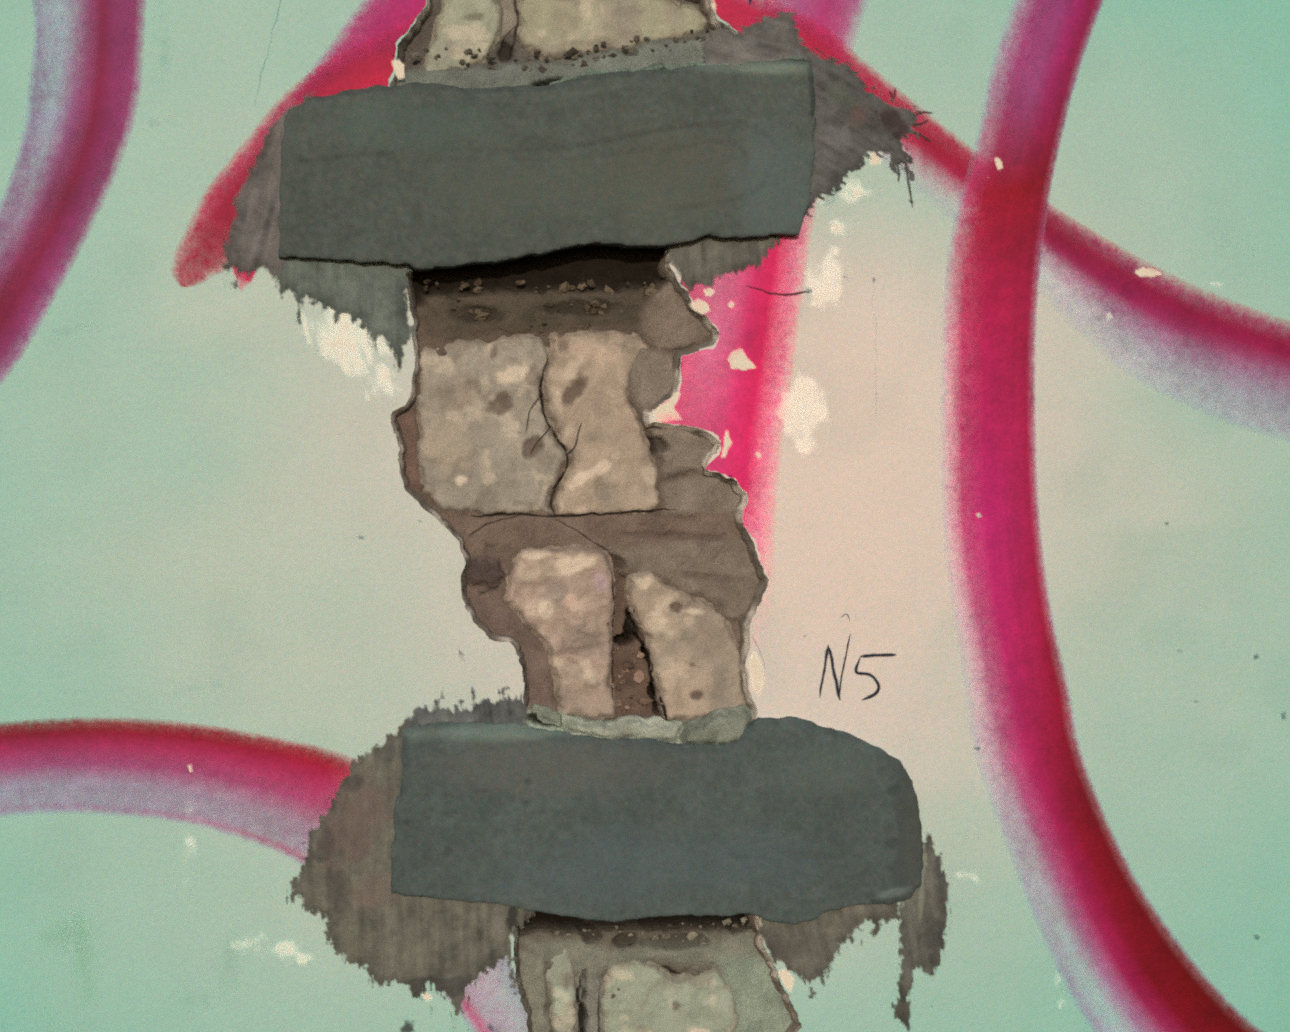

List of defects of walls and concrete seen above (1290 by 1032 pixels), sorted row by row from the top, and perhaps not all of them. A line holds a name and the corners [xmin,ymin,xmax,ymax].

flaking render [392,0,715,88]
peeling [870,152,881,165]
flaking render [396,245,764,744]
flaking render [518,911,793,1032]